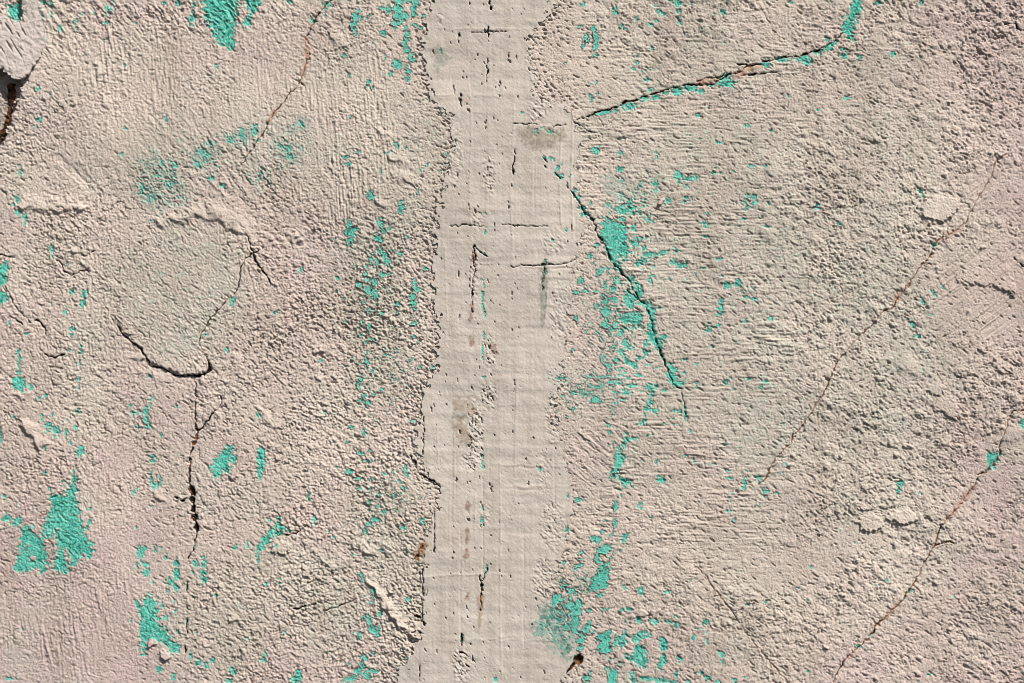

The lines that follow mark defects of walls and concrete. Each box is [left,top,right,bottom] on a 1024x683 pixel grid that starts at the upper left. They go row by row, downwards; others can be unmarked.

peeling [0,0,116,146]
peeling [161,0,264,51]
peeling [349,0,426,82]
peeling [588,46,737,115]
crack [513,32,843,132]
peeling [760,0,888,68]
crack [544,159,688,422]
peeling [699,275,757,332]
peeling [1,348,97,576]
crack [112,237,271,653]
peeling [537,138,748,683]
peeling [130,544,215,669]